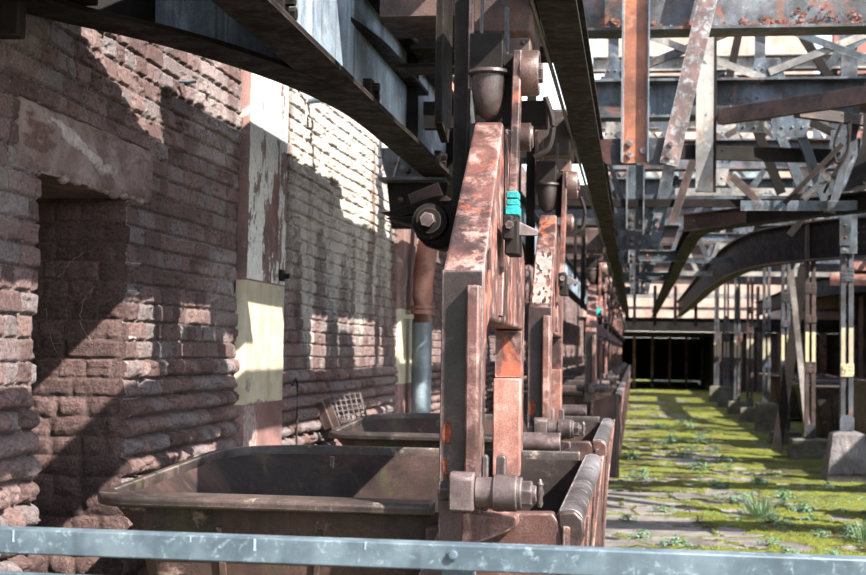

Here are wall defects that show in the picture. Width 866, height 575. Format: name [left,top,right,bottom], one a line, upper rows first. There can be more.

rust [723,4,865,25]
peeling [247,73,289,285]